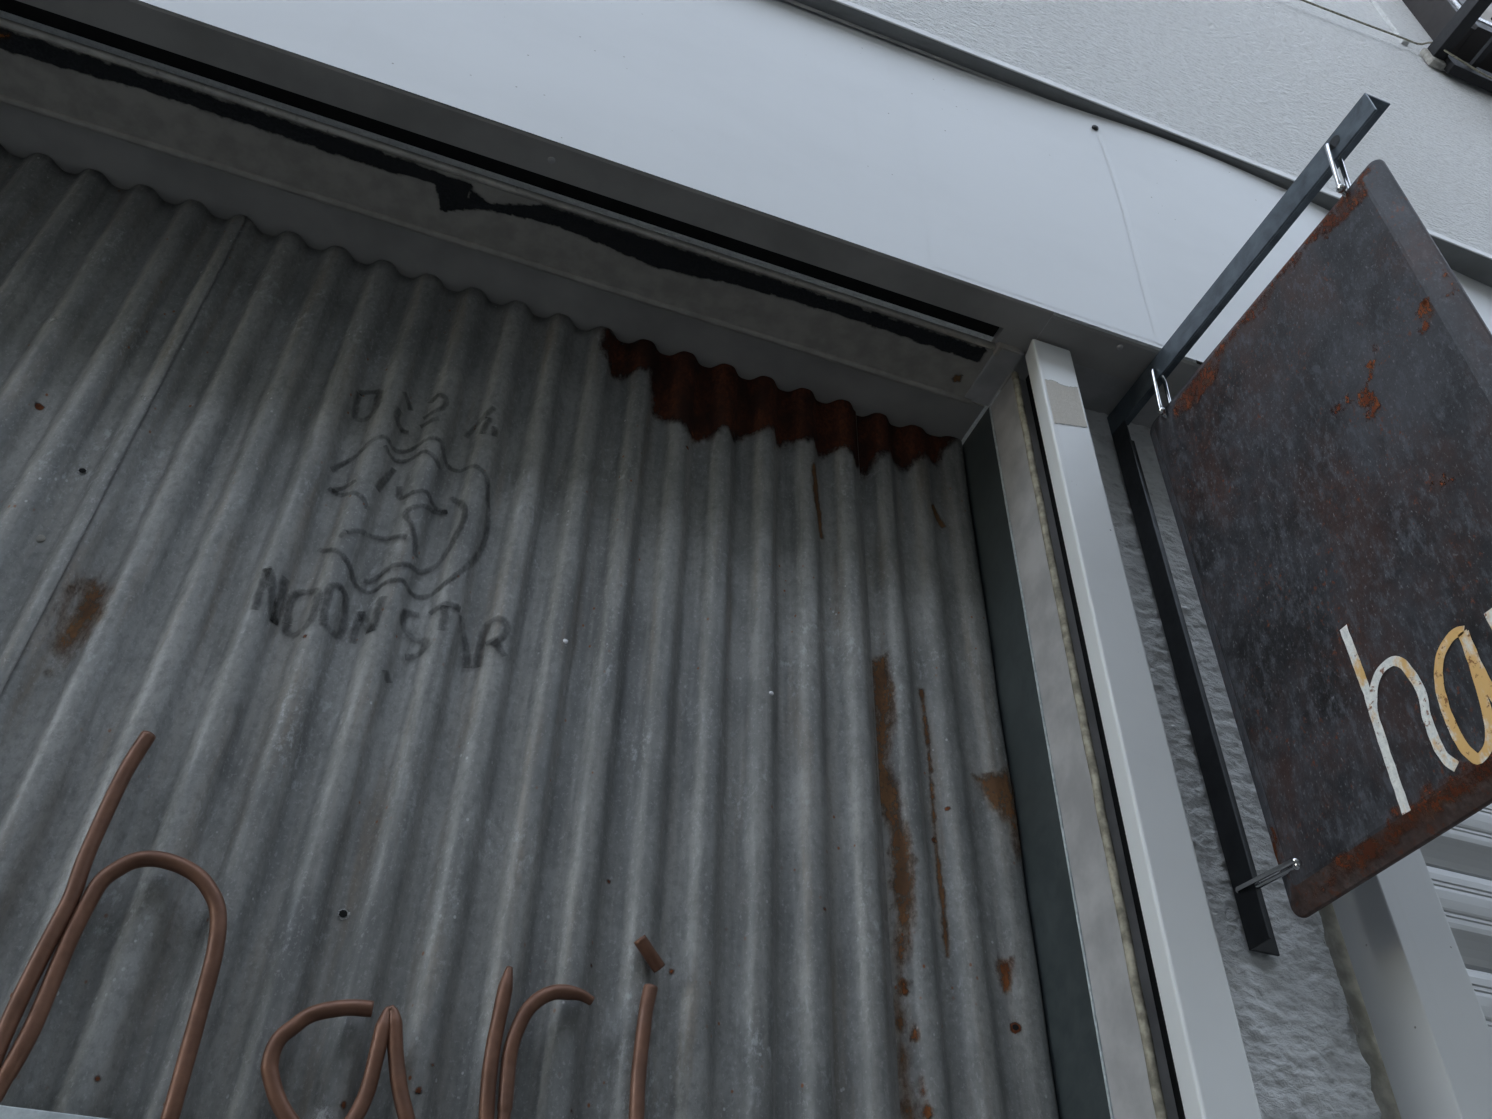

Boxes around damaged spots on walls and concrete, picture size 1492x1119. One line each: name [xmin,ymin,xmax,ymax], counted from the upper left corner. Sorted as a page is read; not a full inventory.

rust [601,328,954,539]
rust [55,579,106,655]
rust [872,655,932,1119]
rust [919,689,950,957]
rust [972,771,1020,853]